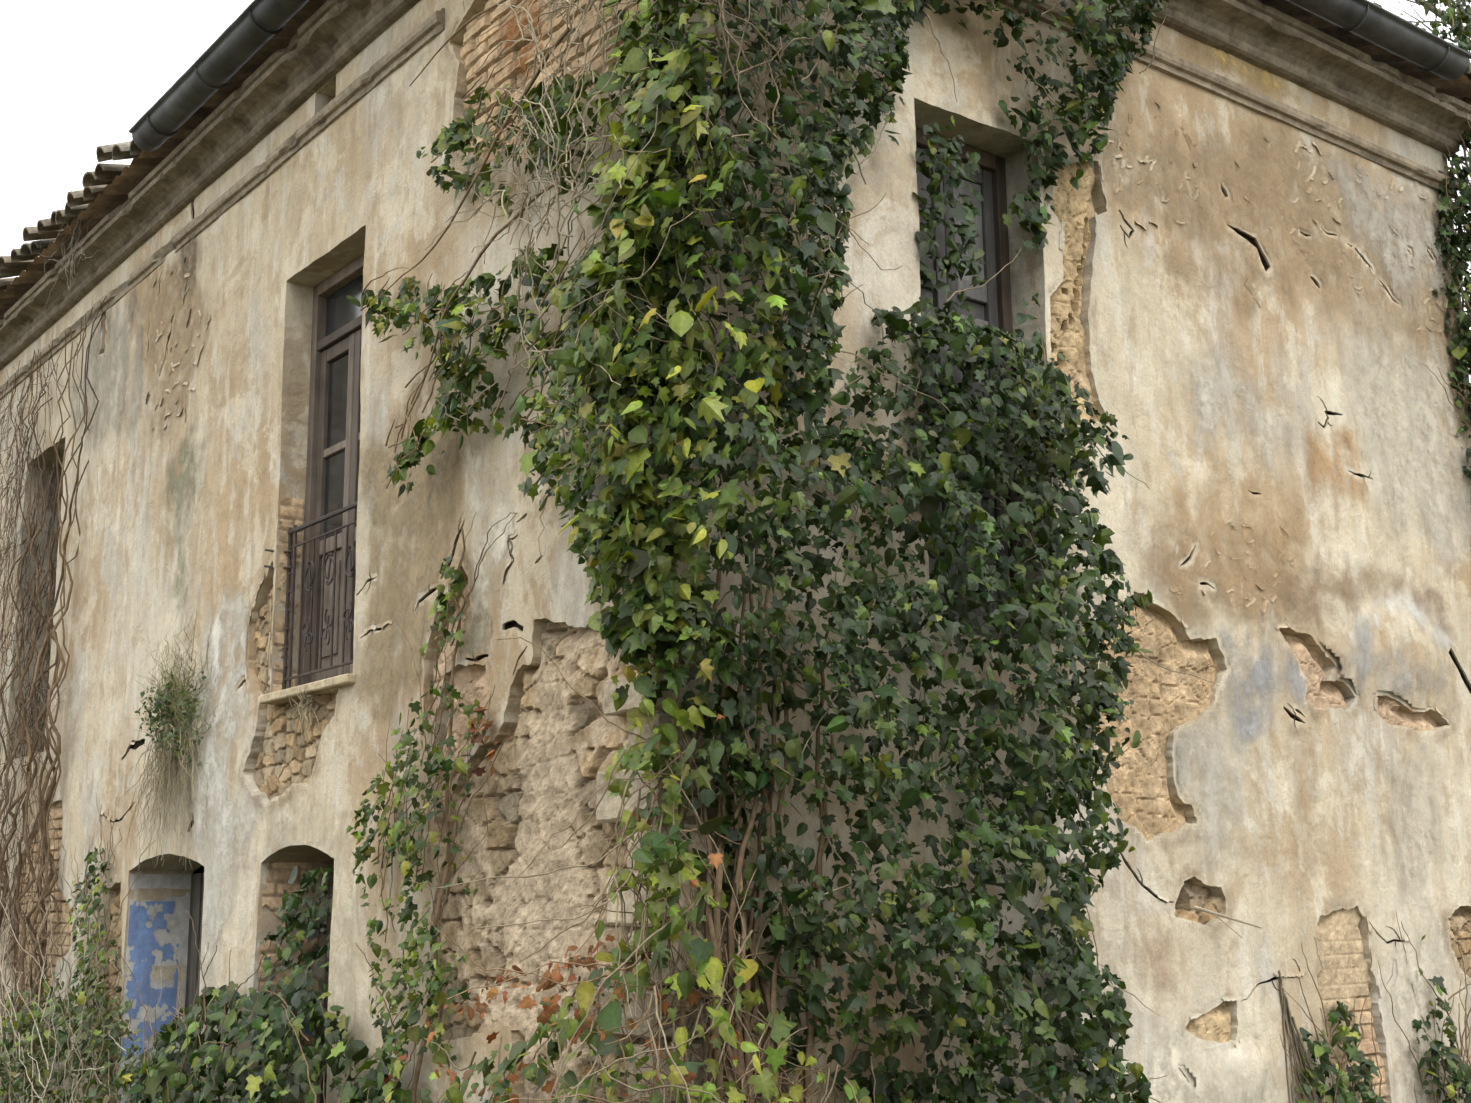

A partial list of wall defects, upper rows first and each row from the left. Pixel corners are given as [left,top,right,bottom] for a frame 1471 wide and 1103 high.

flaking render [459,0,645,162]
water stain [1203,168,1427,349]
flaking render [272,496,303,692]
flaking render [1096,514,1347,841]
water stain [1285,572,1456,698]
spalling [1374,696,1444,731]
peeling [102,888,179,1103]
crack [1122,857,1172,903]
spalling [1174,880,1222,925]
flaking render [1185,995,1238,1043]
flaking render [1314,908,1387,1103]
flaking render [1448,907,1471,978]